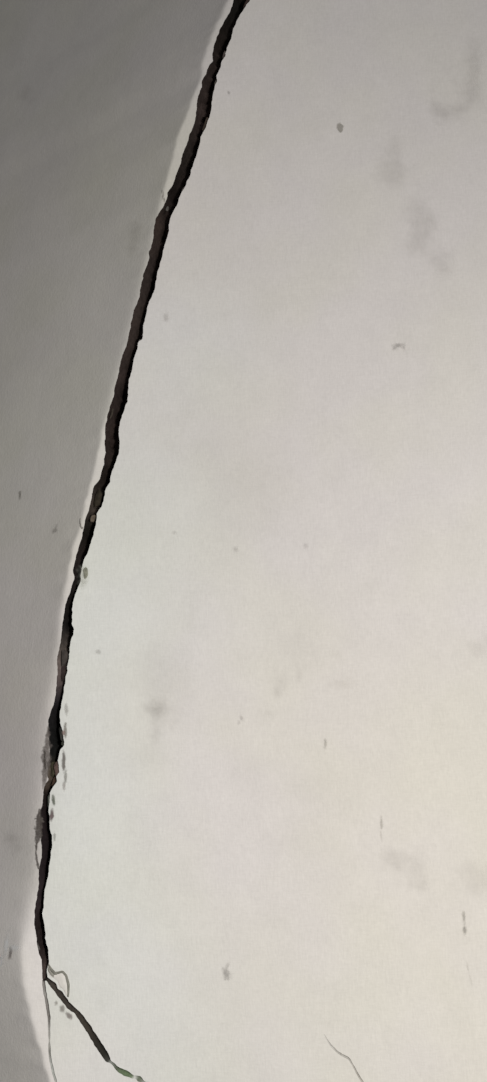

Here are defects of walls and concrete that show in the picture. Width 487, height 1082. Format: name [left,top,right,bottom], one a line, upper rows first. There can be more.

crack [34,0,250,1082]
crack [324,1035,363,1082]